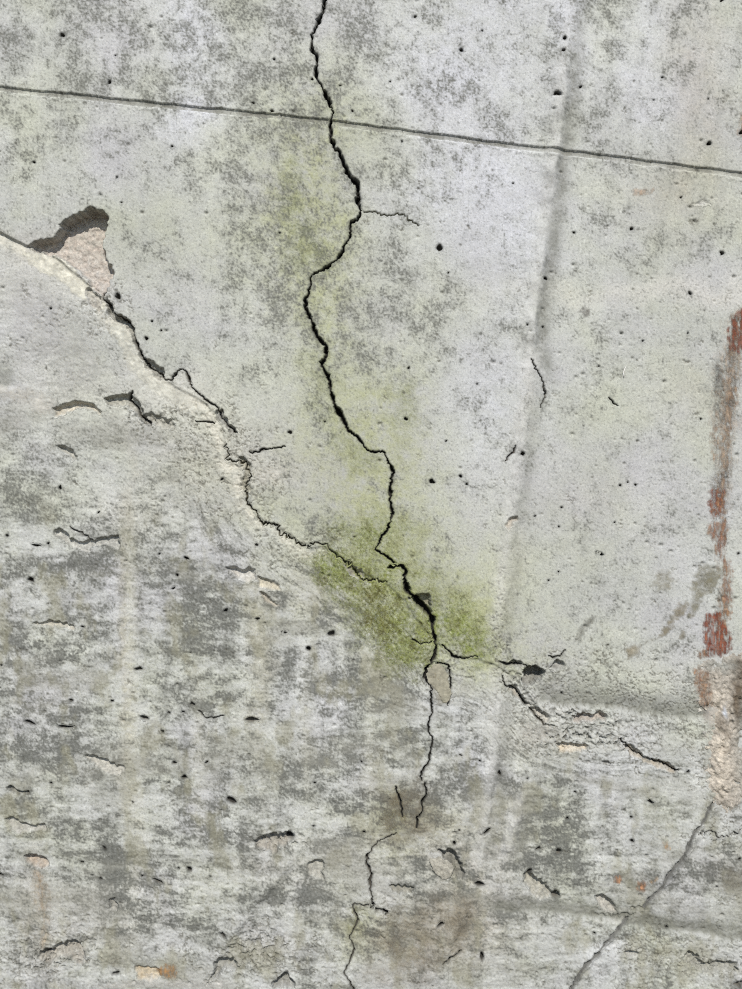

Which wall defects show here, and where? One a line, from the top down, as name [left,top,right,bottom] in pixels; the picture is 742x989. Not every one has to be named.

spalling [28,206,165,381]
corrosion [727,310,742,355]
crack [69,526,93,541]
crack [101,0,566,989]
corrosion [699,583,732,659]
corrosion [708,370,737,571]
crack [567,801,742,989]